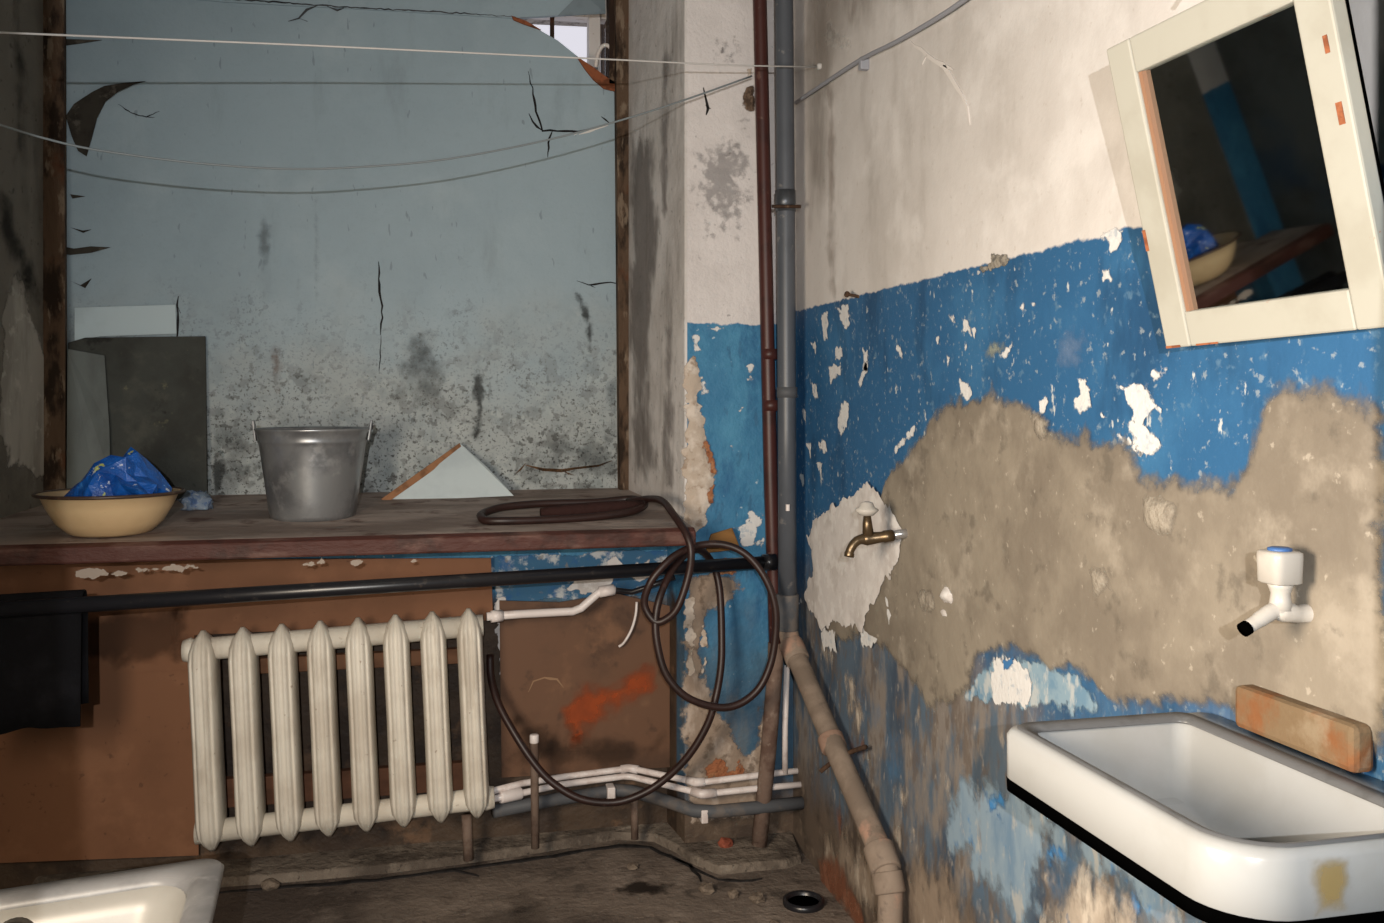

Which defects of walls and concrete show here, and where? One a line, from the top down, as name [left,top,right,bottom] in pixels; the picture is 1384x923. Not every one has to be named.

crack [528,72,609,157]
water stain [474,377,484,437]
spalling [681,327,724,532]
peeling [802,304,850,423]
peeling [859,347,868,387]
peeling [949,315,976,350]
peeling [989,344,1012,358]
water stain [213,455,225,490]
peeling [739,511,764,546]
spalling [799,368,1384,744]
spalling [824,830,878,921]
peeling [903,776,1182,923]